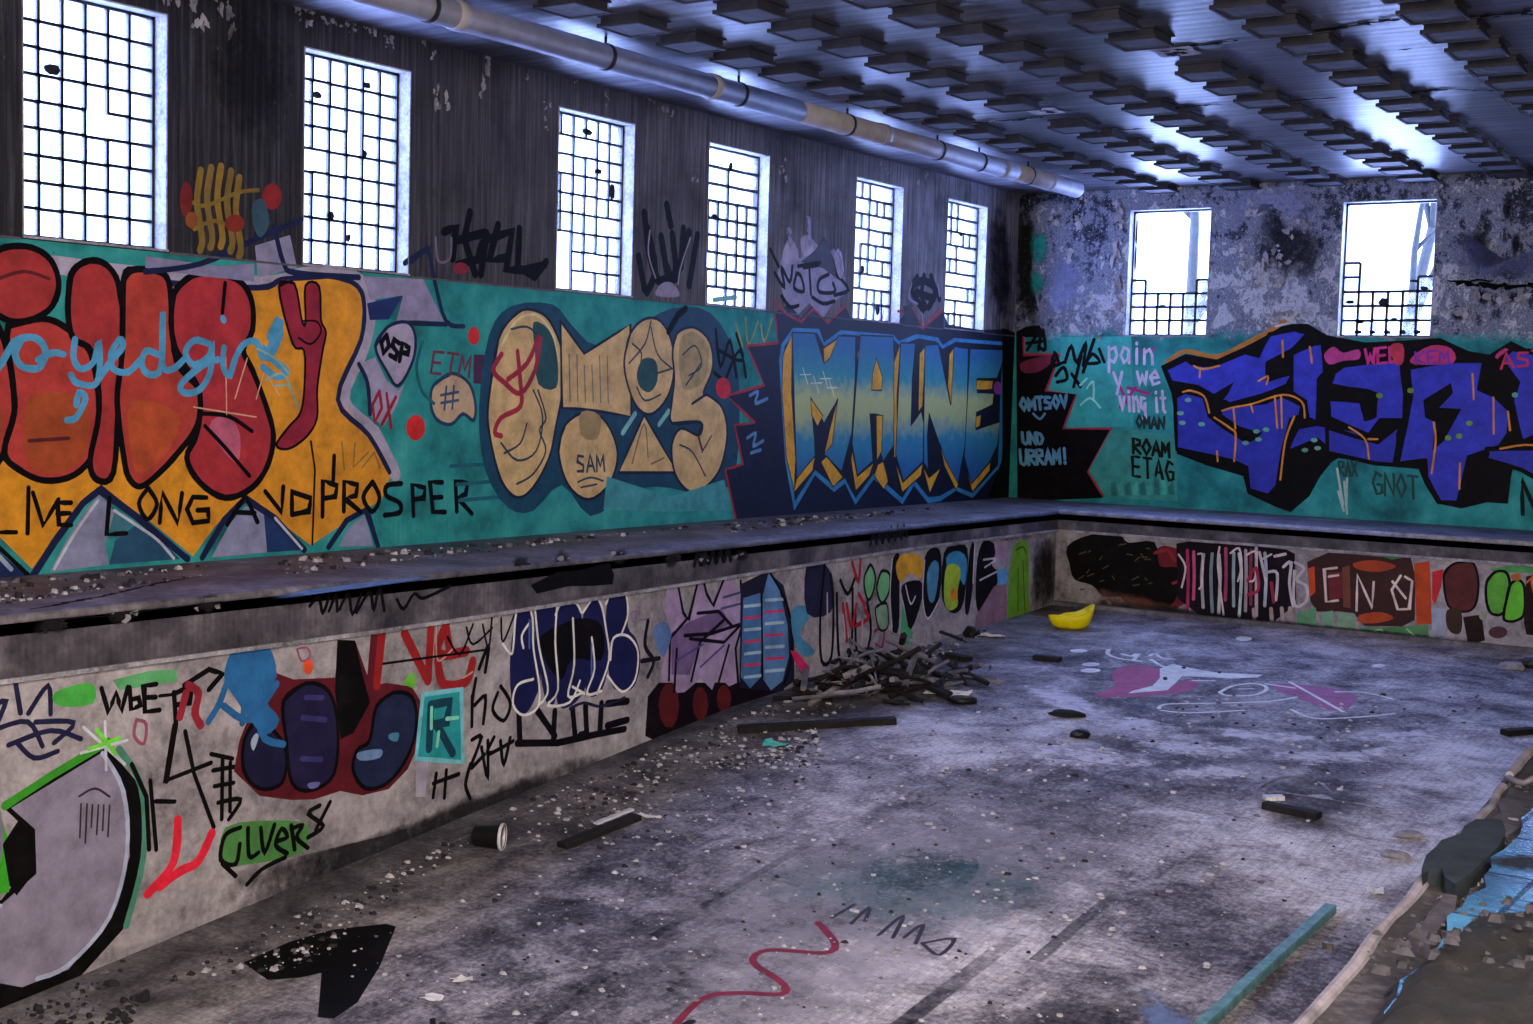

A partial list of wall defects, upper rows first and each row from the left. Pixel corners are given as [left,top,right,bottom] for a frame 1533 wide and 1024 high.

leakage [990,202,1076,327]
leakage [1235,188,1308,218]
leakage [1465,200,1533,275]